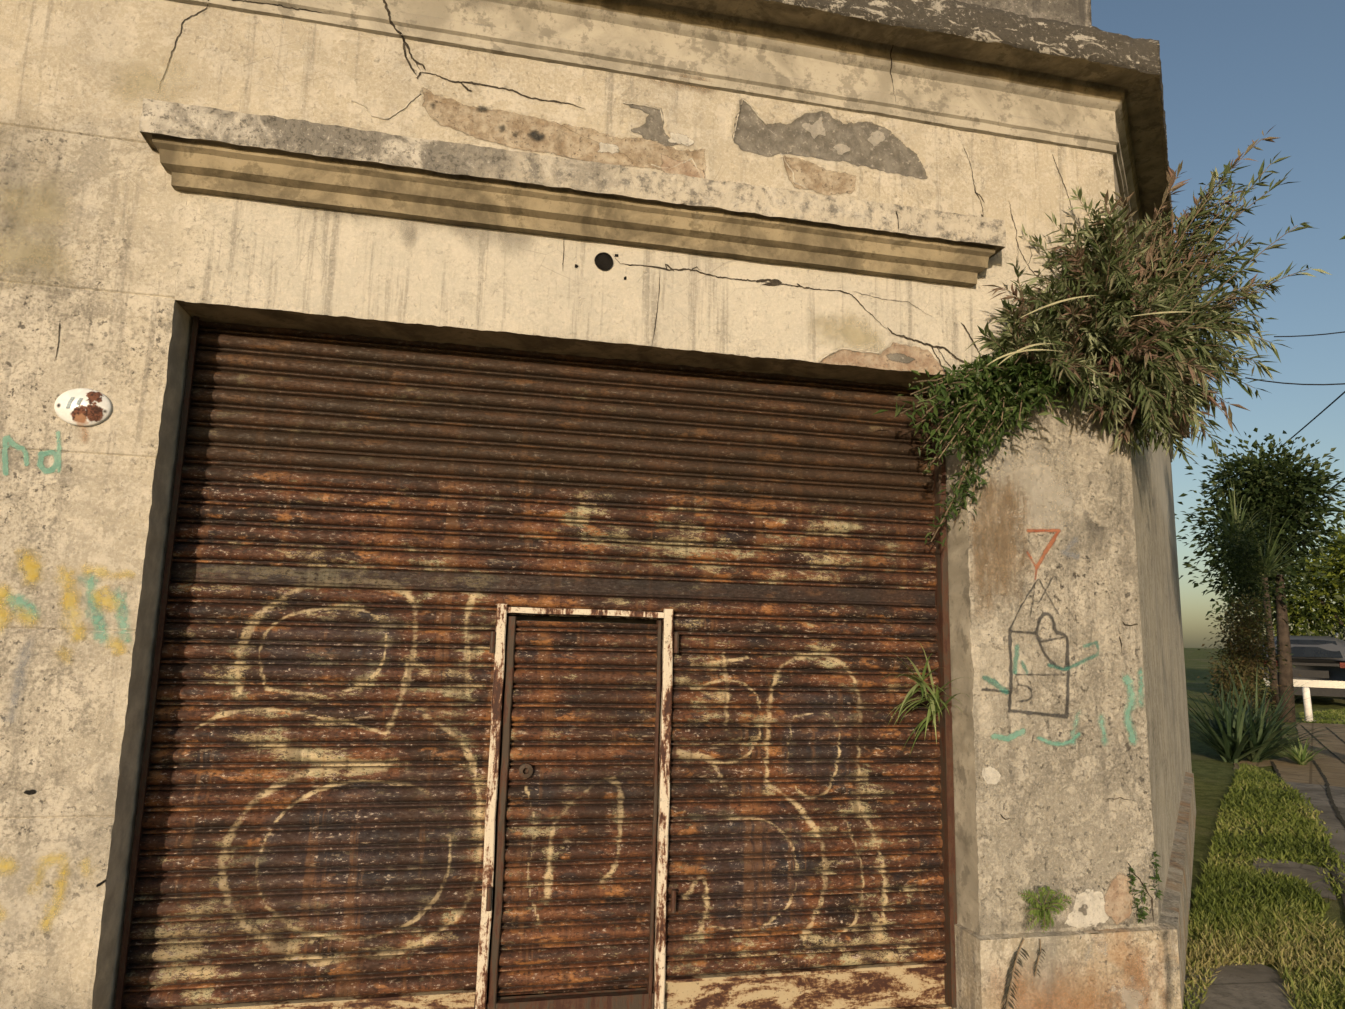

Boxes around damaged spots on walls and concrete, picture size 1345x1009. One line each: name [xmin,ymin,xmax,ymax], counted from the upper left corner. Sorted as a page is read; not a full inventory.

crack [158,0,326,92]
crack [383,0,584,109]
spalling [351,88,706,178]
spalling [733,98,928,195]
crack [615,258,981,373]
spalling [813,343,945,375]